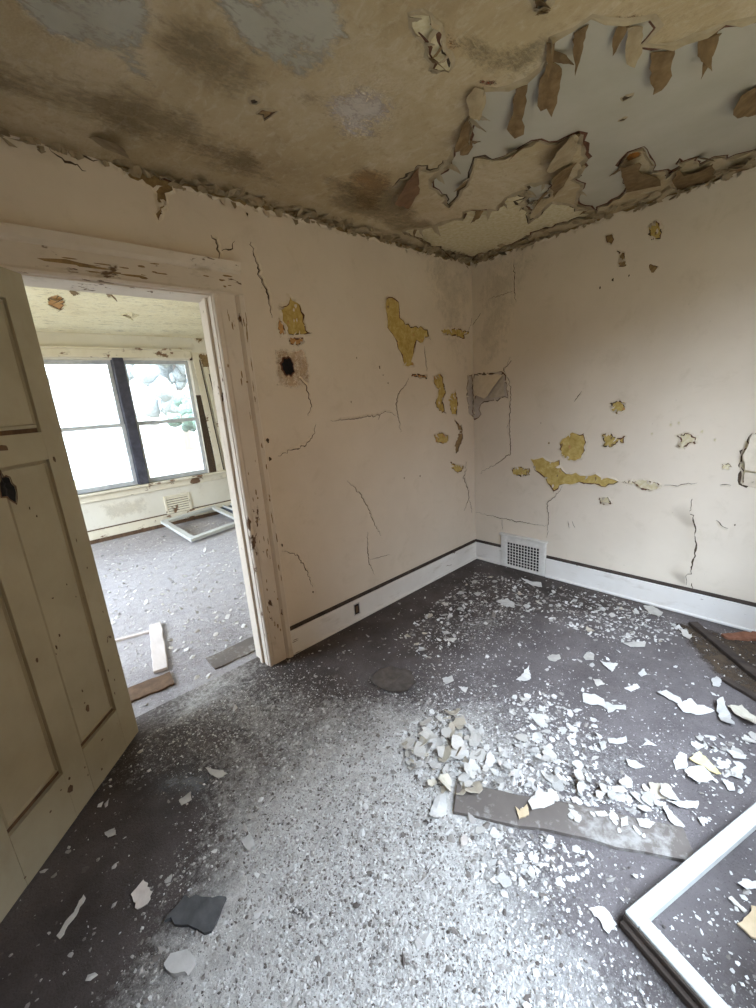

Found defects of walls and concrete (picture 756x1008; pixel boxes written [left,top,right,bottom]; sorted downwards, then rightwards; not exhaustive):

leakage [19,0,148,75]
leakage [215,0,348,75]
peeling [0,127,84,160]
peeling [102,8,756,268]
peeling [276,292,313,377]
crack [278,346,428,455]
peeling [383,294,509,475]
peeling [510,431,664,506]
flaking render [721,432,756,488]
crack [347,479,387,574]